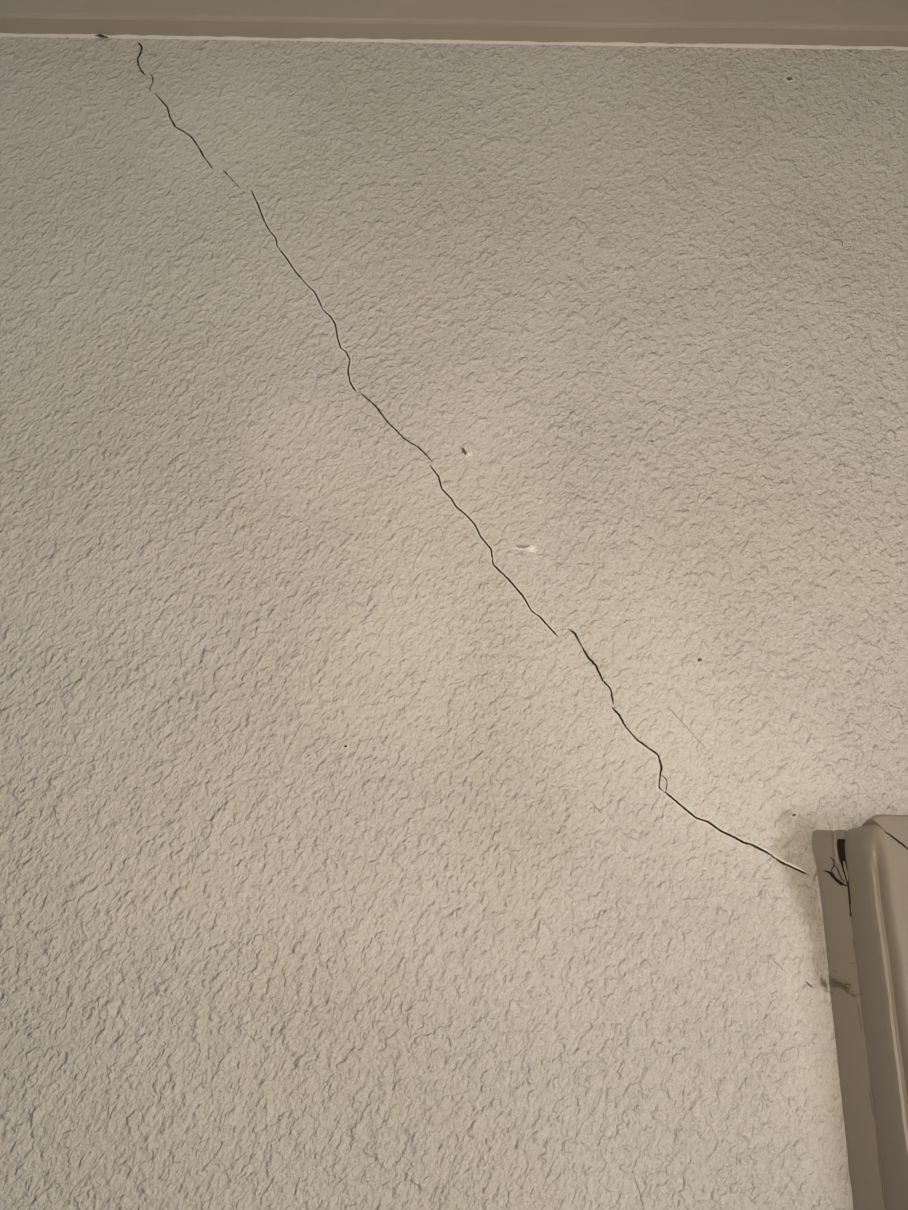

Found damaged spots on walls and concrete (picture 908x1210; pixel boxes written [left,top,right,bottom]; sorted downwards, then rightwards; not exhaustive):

crack [137,42,855,948]